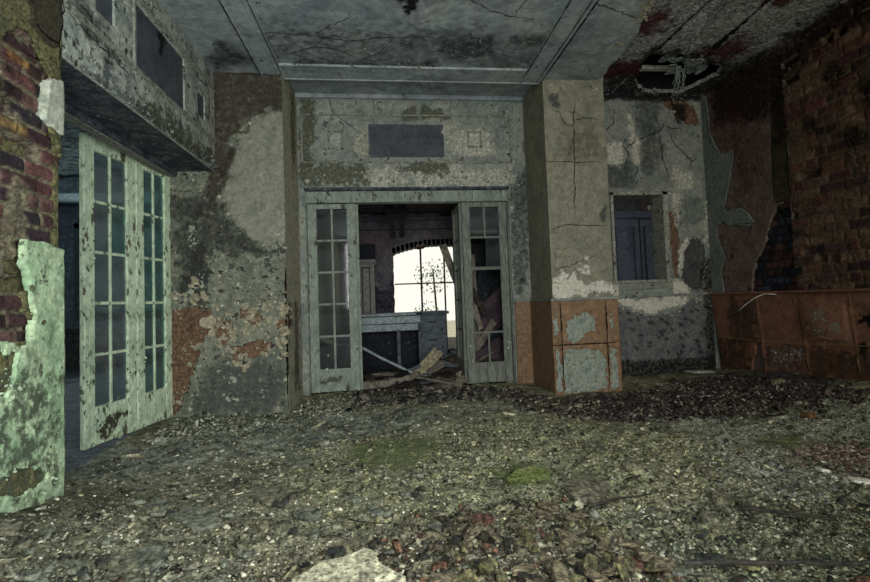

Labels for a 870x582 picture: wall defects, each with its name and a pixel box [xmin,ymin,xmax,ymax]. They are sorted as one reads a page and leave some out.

crack [268,14,468,61]
crack [471,0,549,21]
spalling [0,19,79,279]
damp [170,42,295,310]
crack [546,97,719,230]
spalling [754,0,870,292]
spalling [0,291,46,406]
peeling [160,273,311,415]
spalling [552,195,716,396]